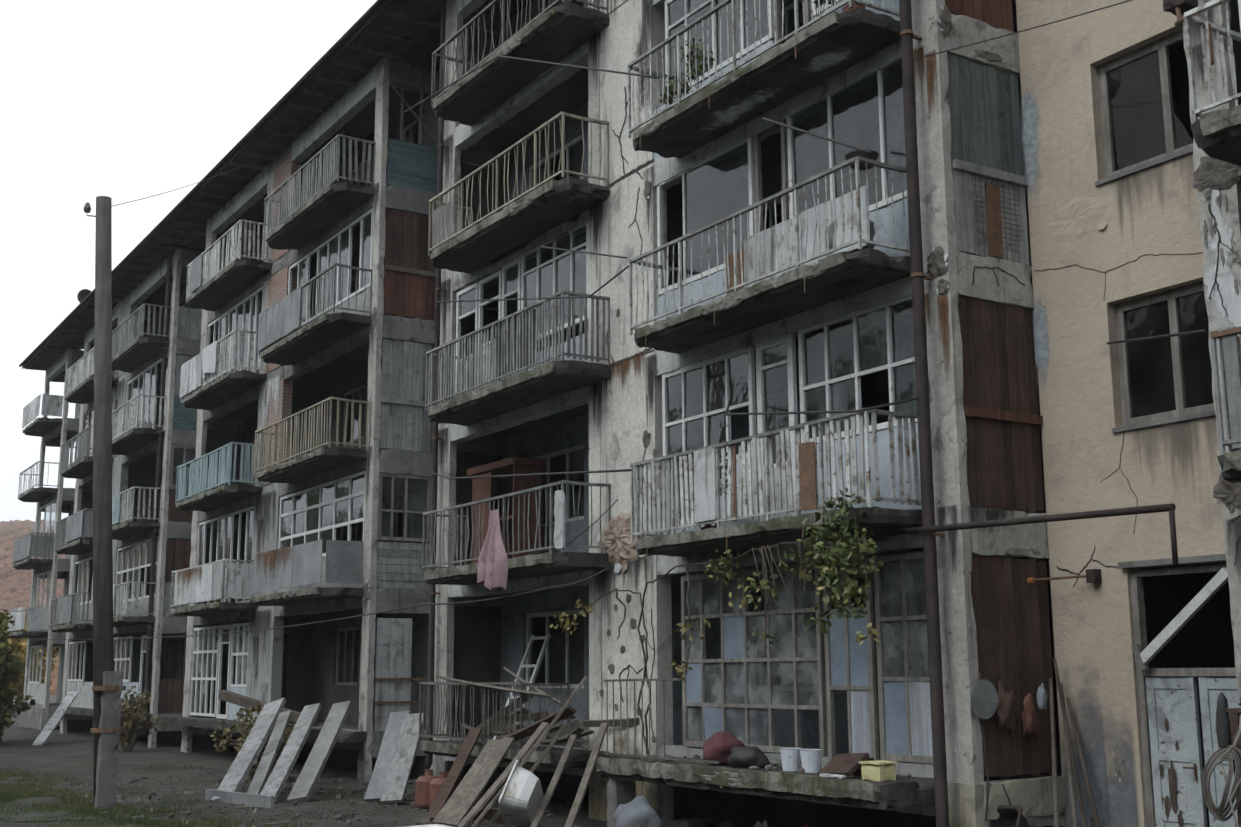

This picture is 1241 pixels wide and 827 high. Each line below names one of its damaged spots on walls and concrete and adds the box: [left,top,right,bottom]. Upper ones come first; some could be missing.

crack [606,86,654,266]
crack [972,203,1234,317]
peeling [1191,156,1241,327]
crack [1101,431,1138,534]